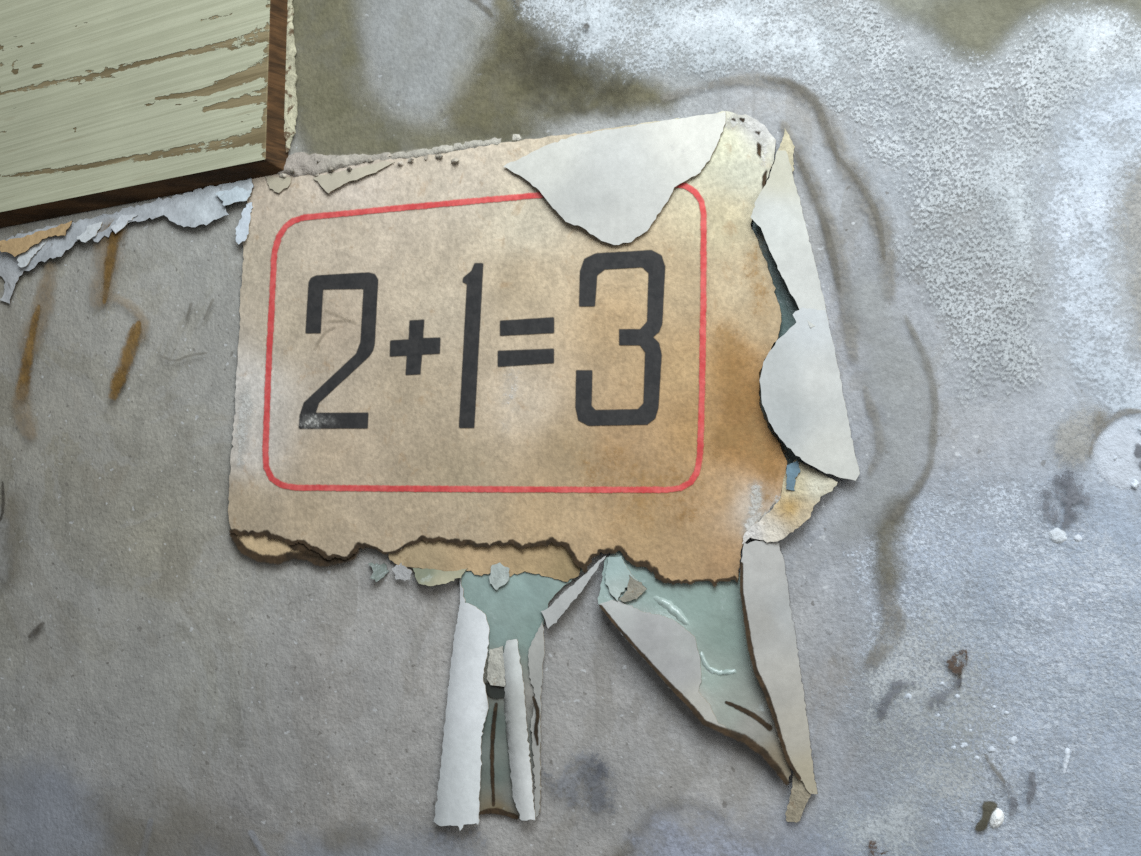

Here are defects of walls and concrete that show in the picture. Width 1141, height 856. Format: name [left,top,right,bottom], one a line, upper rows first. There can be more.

corrosion [103,225,122,304]
peeling [0,176,291,304]
corrosion [16,305,40,399]
corrosion [109,321,141,400]
water stain [292,0,1141,856]